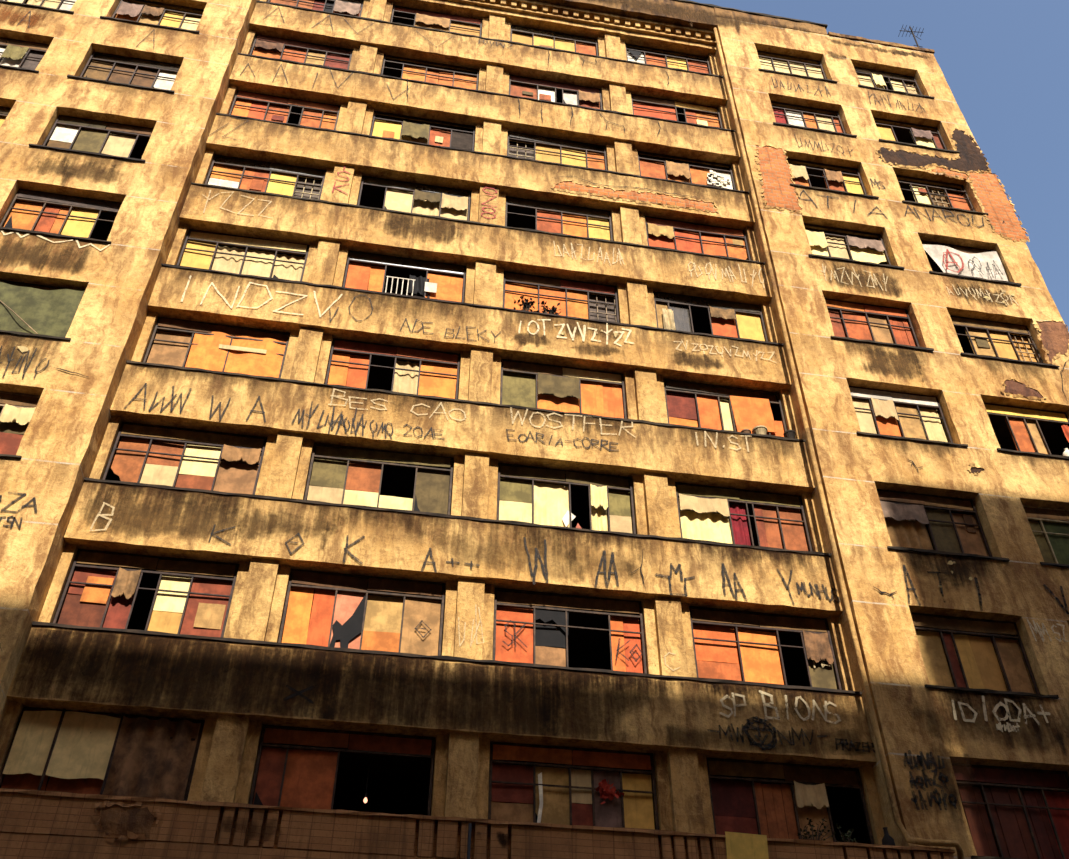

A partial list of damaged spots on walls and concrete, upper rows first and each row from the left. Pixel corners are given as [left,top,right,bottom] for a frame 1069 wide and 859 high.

spalling [551,180,719,213]
spalling [754,145,802,214]
spalling [876,128,1030,243]
spalling [1032,319,1069,365]
spalling [1000,378,1047,402]
damp [56,627,215,646]
damp [275,646,435,667]
spalling [91,800,161,843]